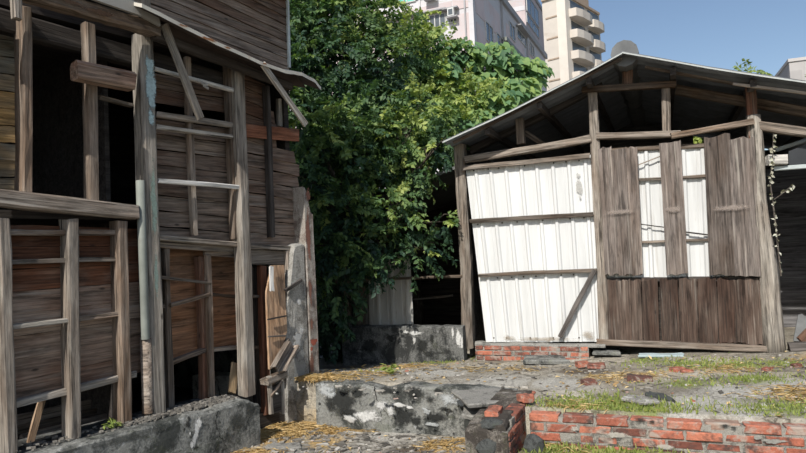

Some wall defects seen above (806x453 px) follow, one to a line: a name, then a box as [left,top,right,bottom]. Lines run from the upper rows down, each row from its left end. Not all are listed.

peeling [146,58,156,124]
peeling [293,319,317,372]
water stain [404,330,433,356]
water stain [326,387,364,415]
water stain [378,386,442,402]
water stain [394,407,447,425]
water stain [109,434,143,444]
water stain [184,416,202,449]